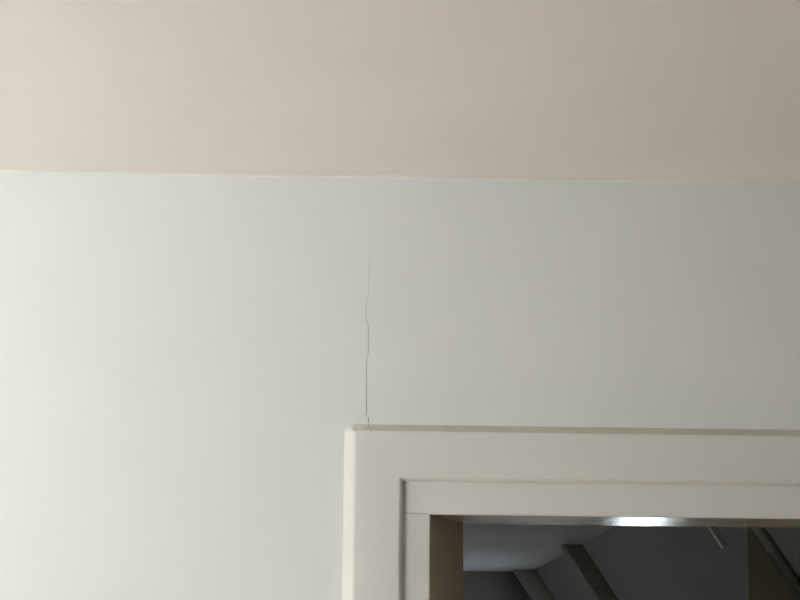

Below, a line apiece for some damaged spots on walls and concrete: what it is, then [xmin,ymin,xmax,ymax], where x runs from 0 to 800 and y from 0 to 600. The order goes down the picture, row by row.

crack [353,333,372,431]